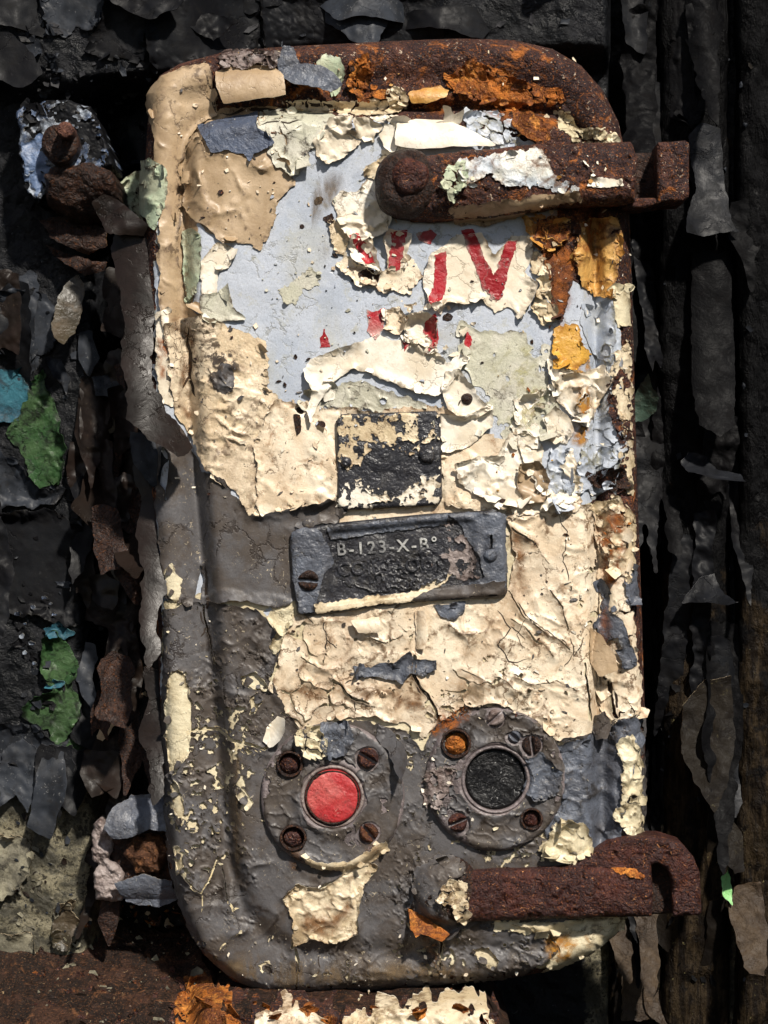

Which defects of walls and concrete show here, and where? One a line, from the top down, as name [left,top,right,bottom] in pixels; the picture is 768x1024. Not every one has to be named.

rust [346,53,388,103]
rust [417,61,567,129]
peeling [553,0,662,153]
peeling [583,160,624,188]
rust [533,213,610,320]
peeling [681,0,763,606]
peeling [0,0,582,839]
peeling [241,212,768,976]
crack [559,515,569,580]
crack [497,591,618,718]
peeling [0,834,34,901]
rust [612,867,645,880]